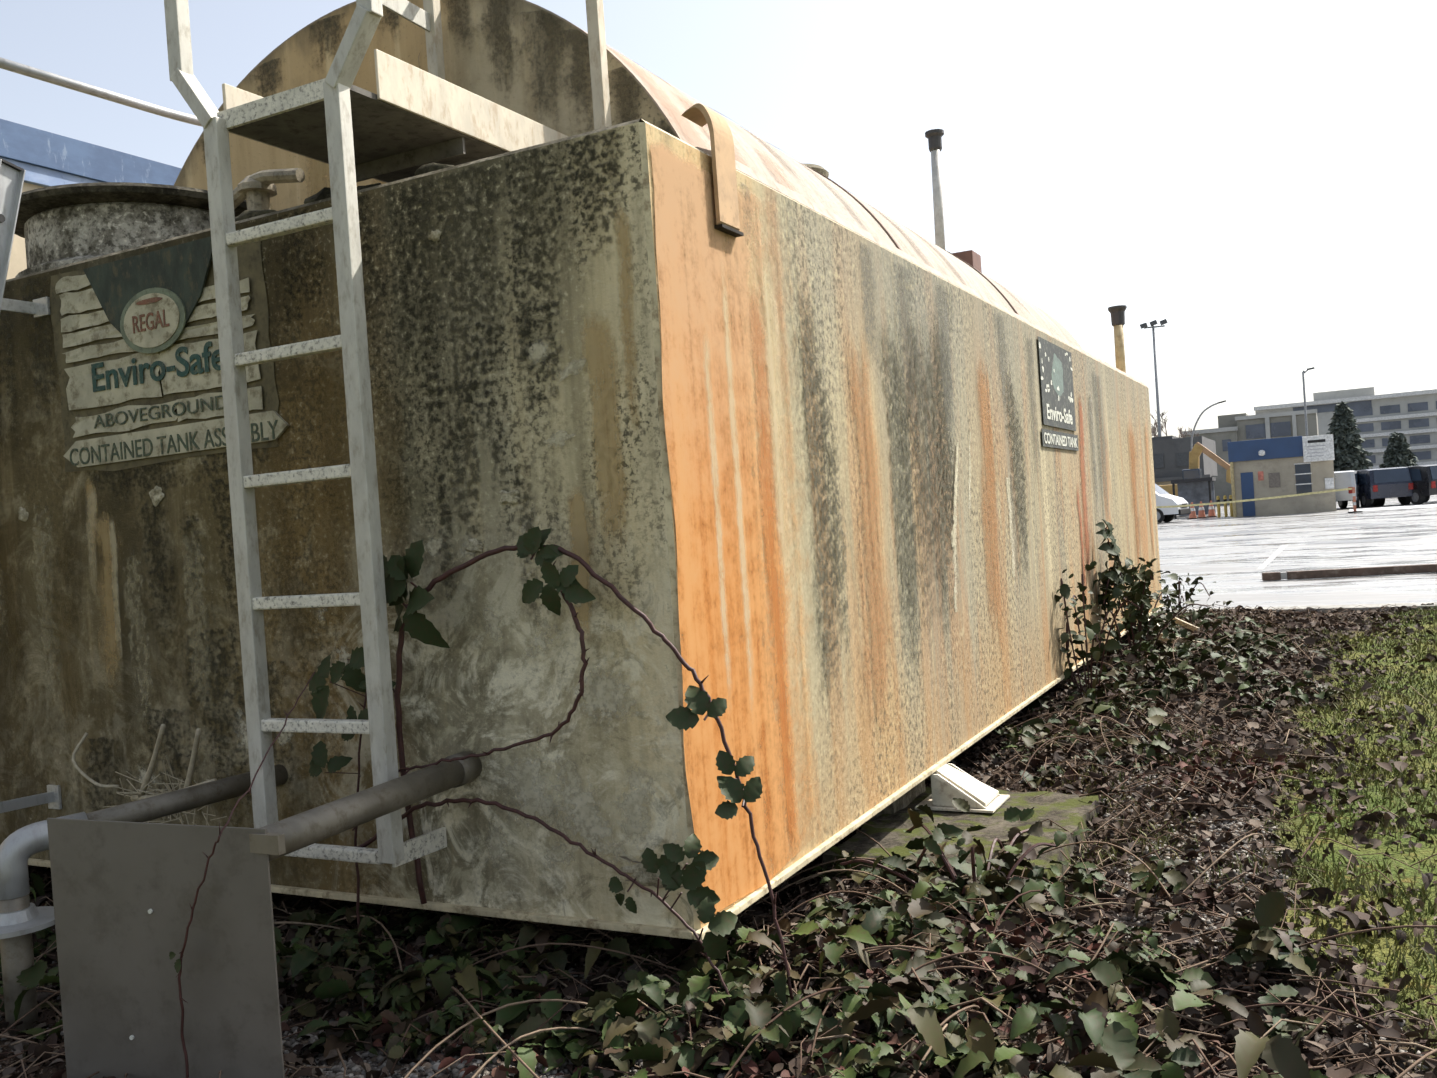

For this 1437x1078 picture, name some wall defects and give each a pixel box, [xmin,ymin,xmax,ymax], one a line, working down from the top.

leakage [570,67,639,241]
leakage [357,196,384,328]
leakage [512,149,559,406]
leakage [391,167,502,587]
leakage [204,452,238,607]
corrosion [650,144,811,913]
leakage [797,296,850,698]
leakage [882,321,958,661]
leakage [1006,381,1029,573]
corrosion [1077,399,1090,586]
leakage [145,709,191,788]
leakage [267,662,289,761]